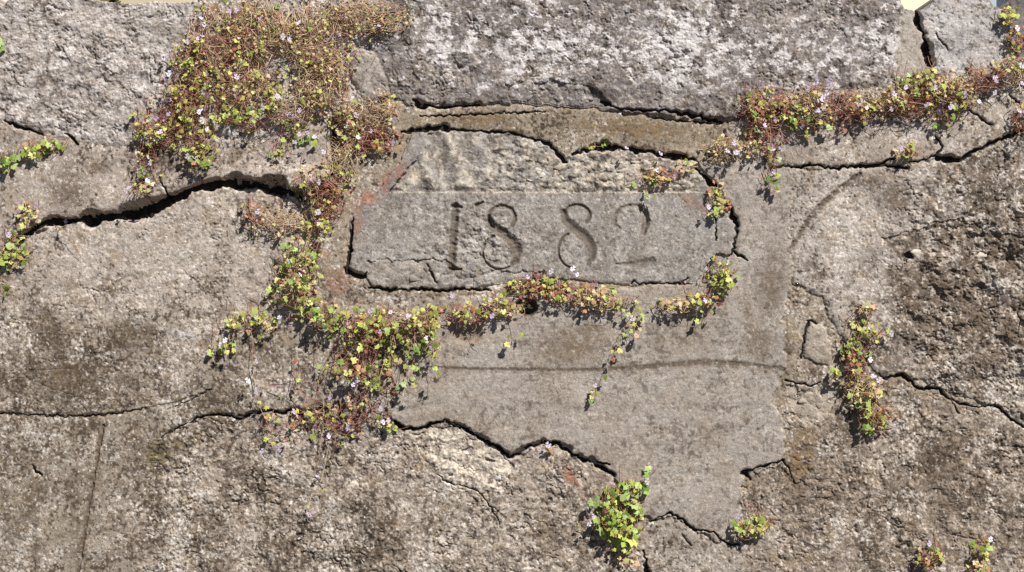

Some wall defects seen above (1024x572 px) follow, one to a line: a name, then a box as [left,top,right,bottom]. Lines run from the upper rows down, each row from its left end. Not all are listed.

crack [913,10,948,67]
crack [772,89,1024,171]
crack [20,178,307,242]
crack [882,373,1024,428]
crack [394,419,615,475]
crack [740,459,795,483]
crack [437,474,500,527]
crack [650,511,739,546]